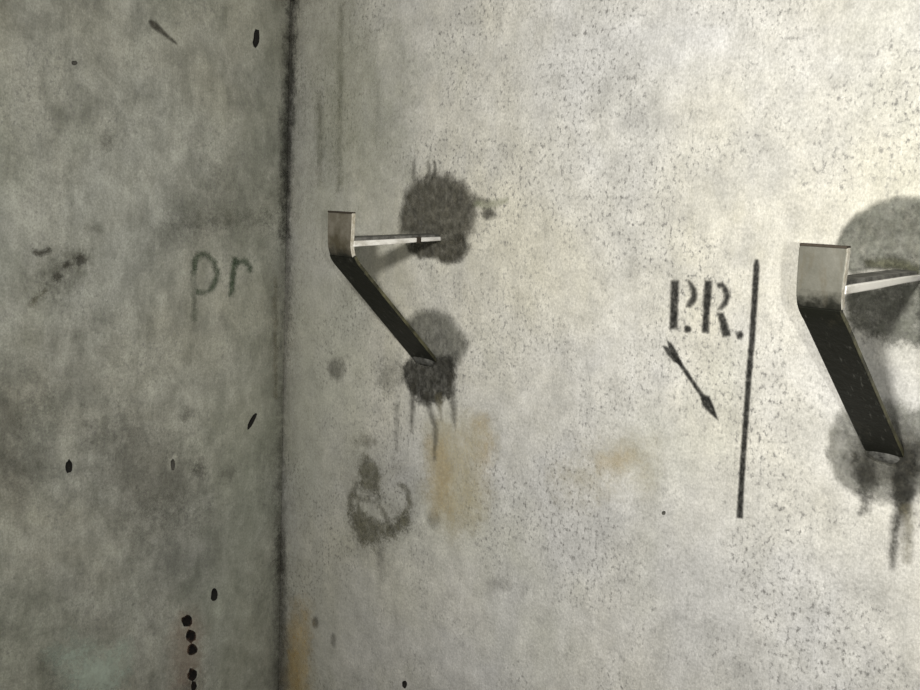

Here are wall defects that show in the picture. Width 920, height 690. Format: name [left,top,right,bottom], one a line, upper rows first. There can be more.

leakage [866,258,919,271]
leakage [359,456,380,494]
leakage [351,494,410,544]